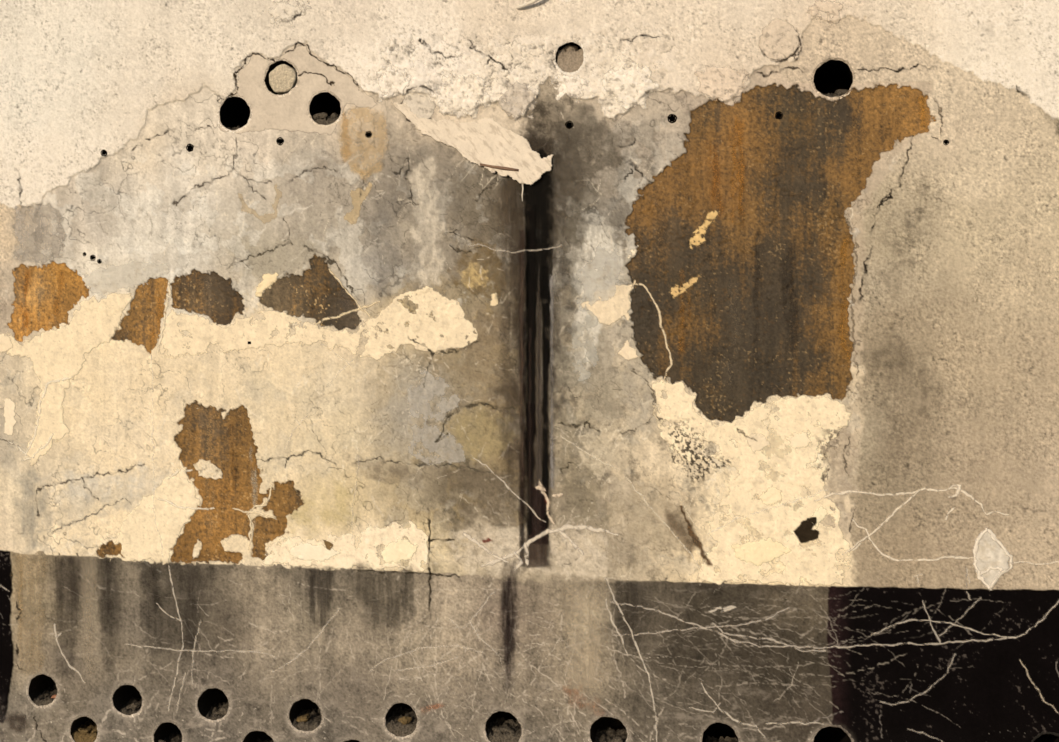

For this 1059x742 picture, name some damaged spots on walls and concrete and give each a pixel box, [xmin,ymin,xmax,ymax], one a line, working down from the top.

spalling [217,42,377,135]
hole [811,57,856,100]
crack [173,141,335,206]
rust [111,269,245,354]
crack [240,218,353,293]
rust [259,254,361,330]
peeling [160,286,478,360]
leakage [519,149,583,567]
rust [625,83,936,423]
crack [36,464,145,532]
rust [170,400,304,564]
peeling [652,380,851,586]